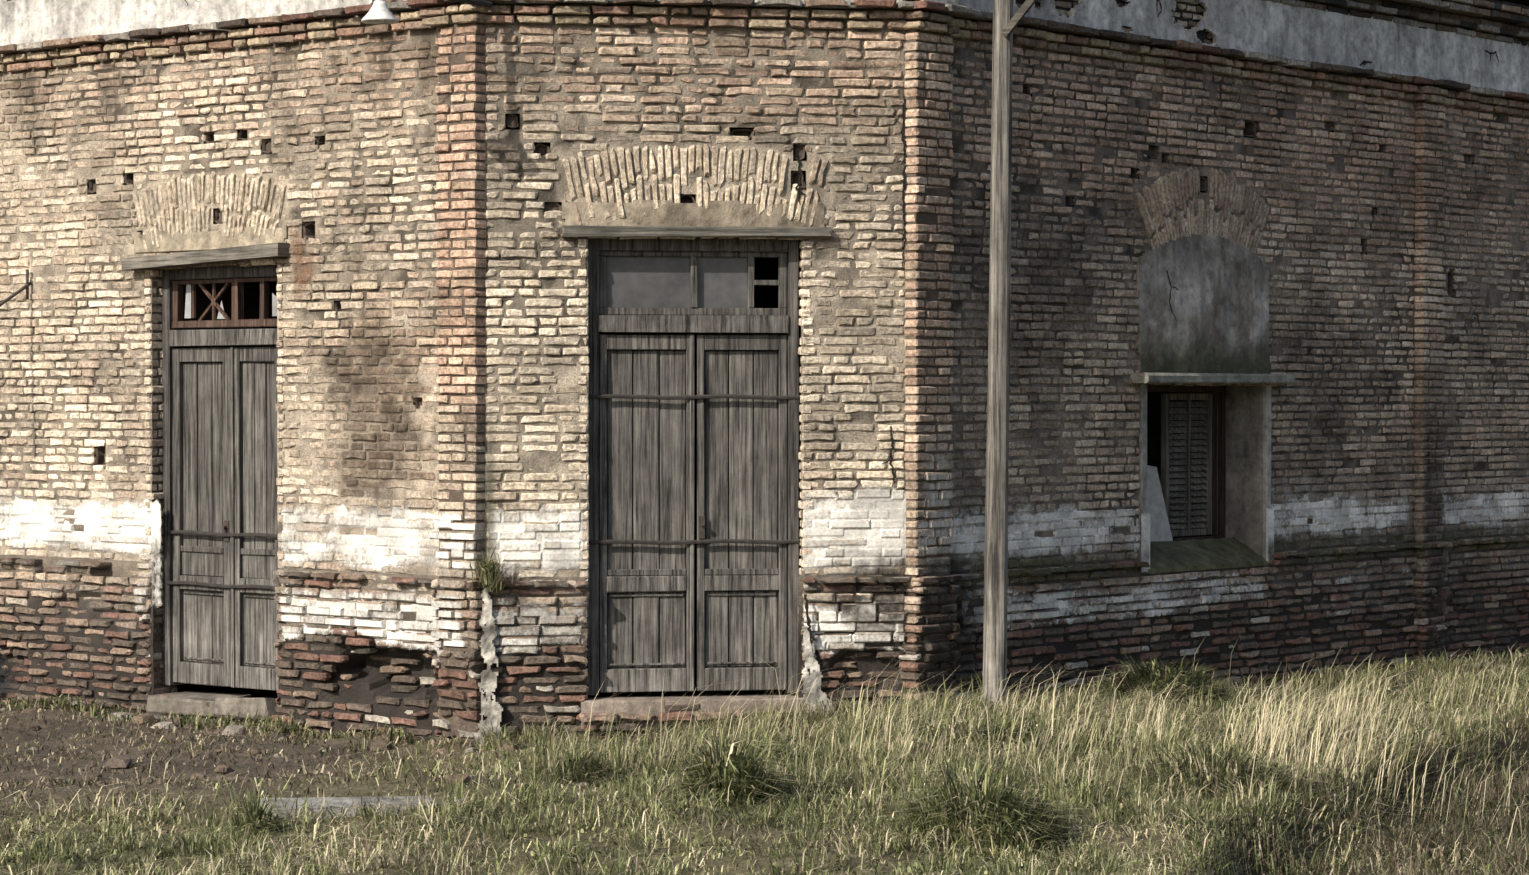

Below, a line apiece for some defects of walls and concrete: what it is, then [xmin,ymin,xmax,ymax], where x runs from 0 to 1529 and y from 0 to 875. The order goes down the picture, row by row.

spalling [1164,0,1218,46]
peeling [280,504,583,748]